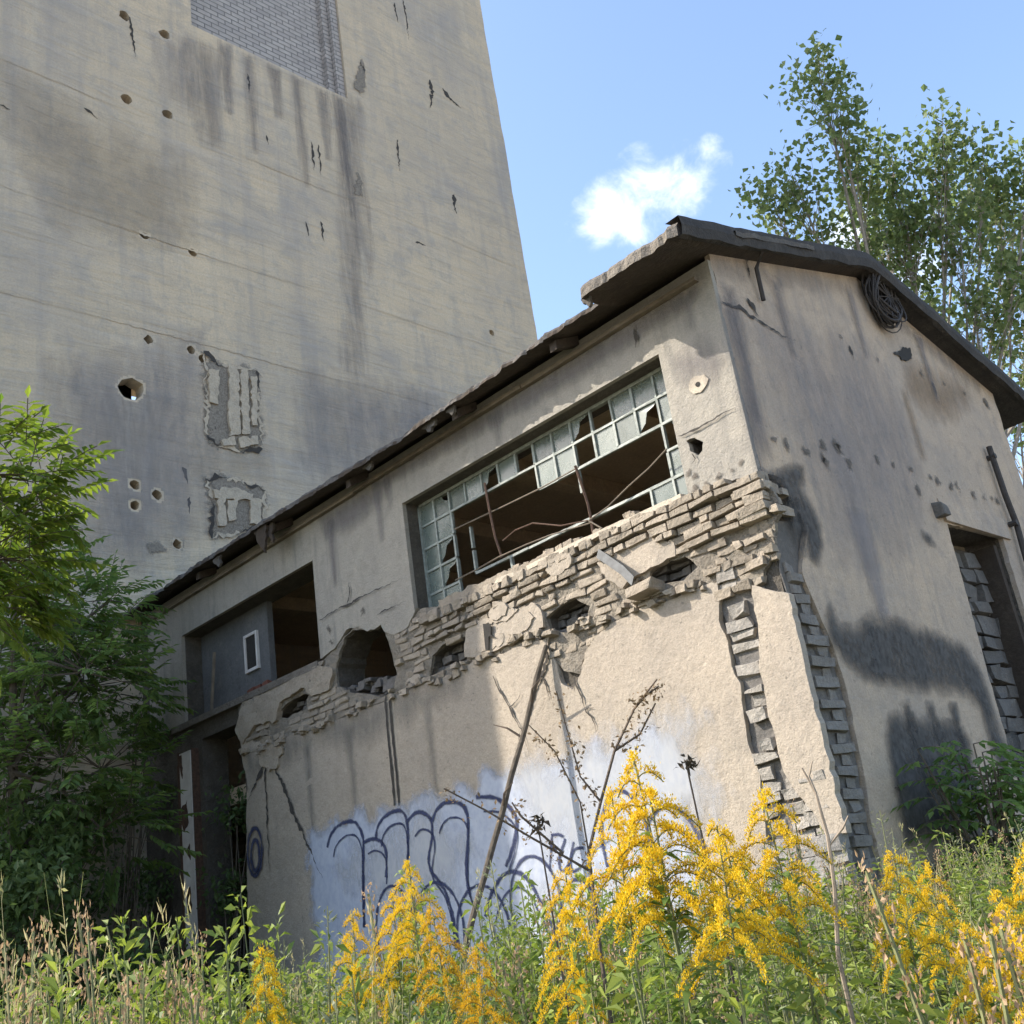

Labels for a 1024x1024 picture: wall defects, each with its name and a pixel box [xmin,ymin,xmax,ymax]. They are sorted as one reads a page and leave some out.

crack [723,259,792,340]
spalling [203,351,265,454]
spalling [802,440,852,468]
spalling [204,473,269,539]
spalling [235,459,897,969]
crack [248,767,322,875]